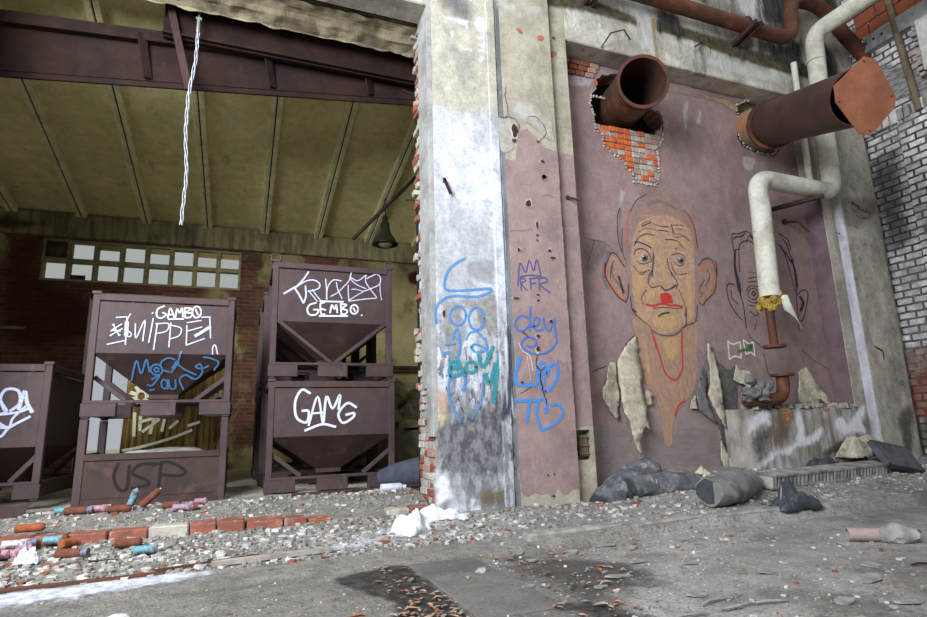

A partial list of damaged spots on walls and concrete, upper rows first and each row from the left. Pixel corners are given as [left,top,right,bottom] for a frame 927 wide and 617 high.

water stain [625,1,684,55]
water stain [737,0,785,22]
water stain [708,56,781,82]
water stain [774,43,807,75]
water stain [824,45,838,77]
flaking render [551,51,665,187]
peeling [603,335,653,455]
peeling [690,343,859,467]
flaking render [910,374,927,418]
efflorescence [436,471,454,507]